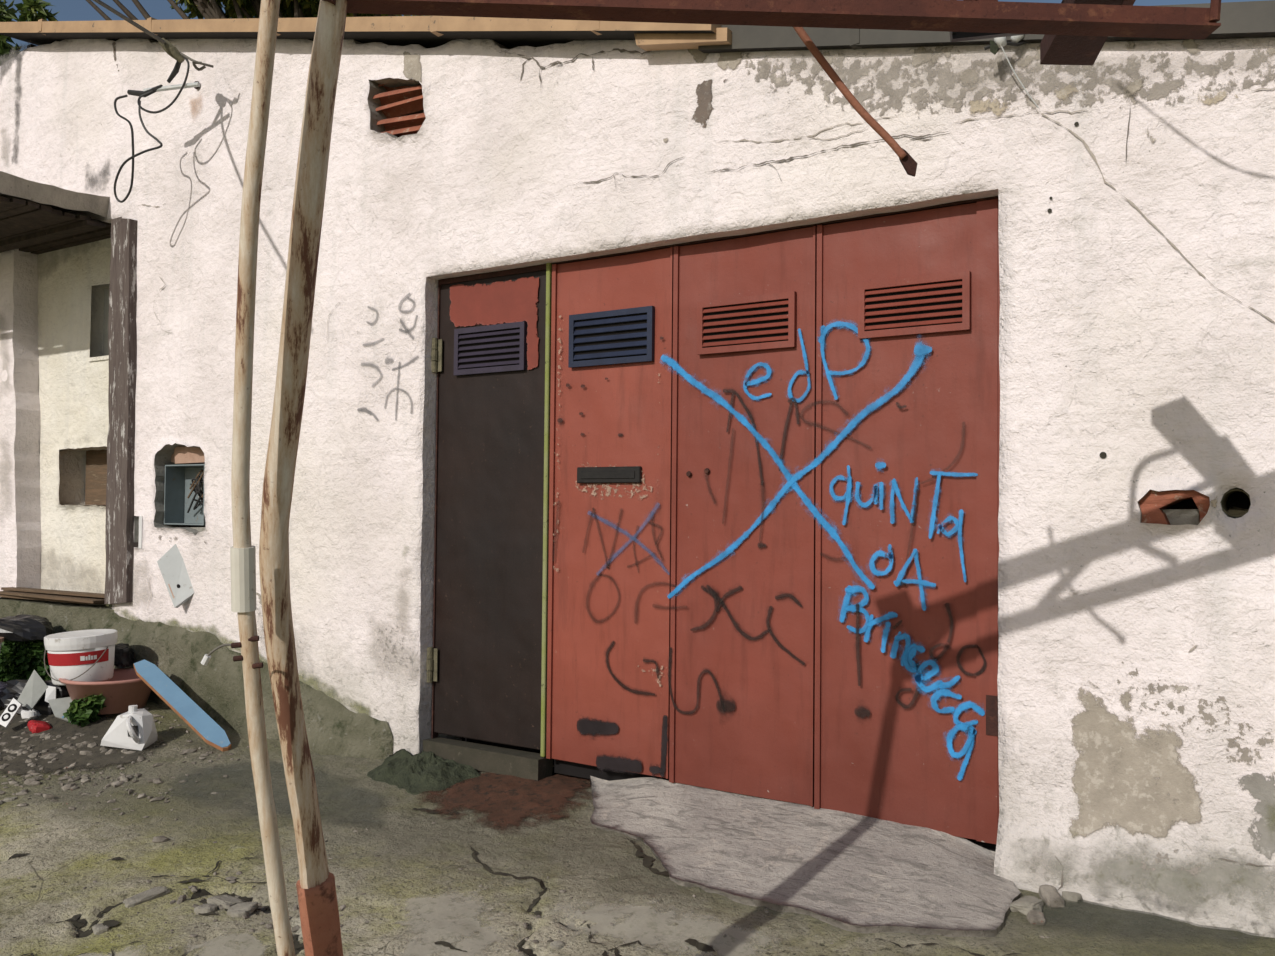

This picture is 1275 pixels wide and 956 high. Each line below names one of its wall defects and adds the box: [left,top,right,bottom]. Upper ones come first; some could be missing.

crack [499,48,651,84]
peeling [688,39,1275,128]
crack [573,157,682,188]
crack [711,109,1275,323]
spalling [1069,662,1275,871]